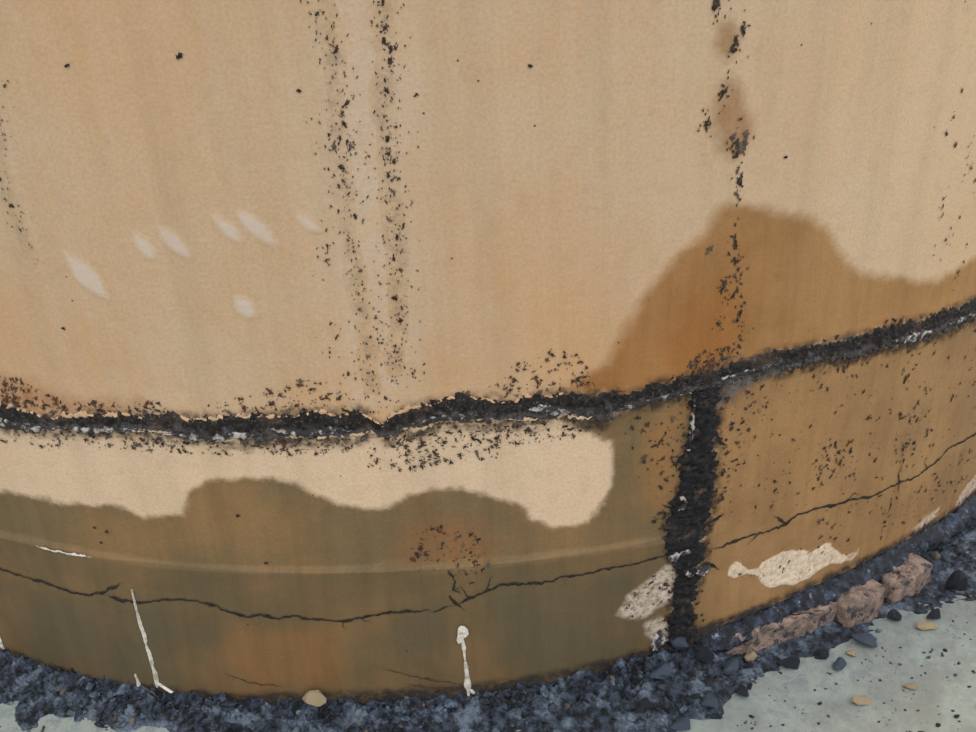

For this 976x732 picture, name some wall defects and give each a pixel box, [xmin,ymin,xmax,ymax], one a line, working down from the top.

damp [695,0,769,176]
corrosion [656,267,752,378]
damp [544,186,976,397]
damp [0,391,696,706]
crack [0,297,976,653]
peeling [727,510,861,589]
damp [691,317,976,634]
peeling [848,448,976,540]